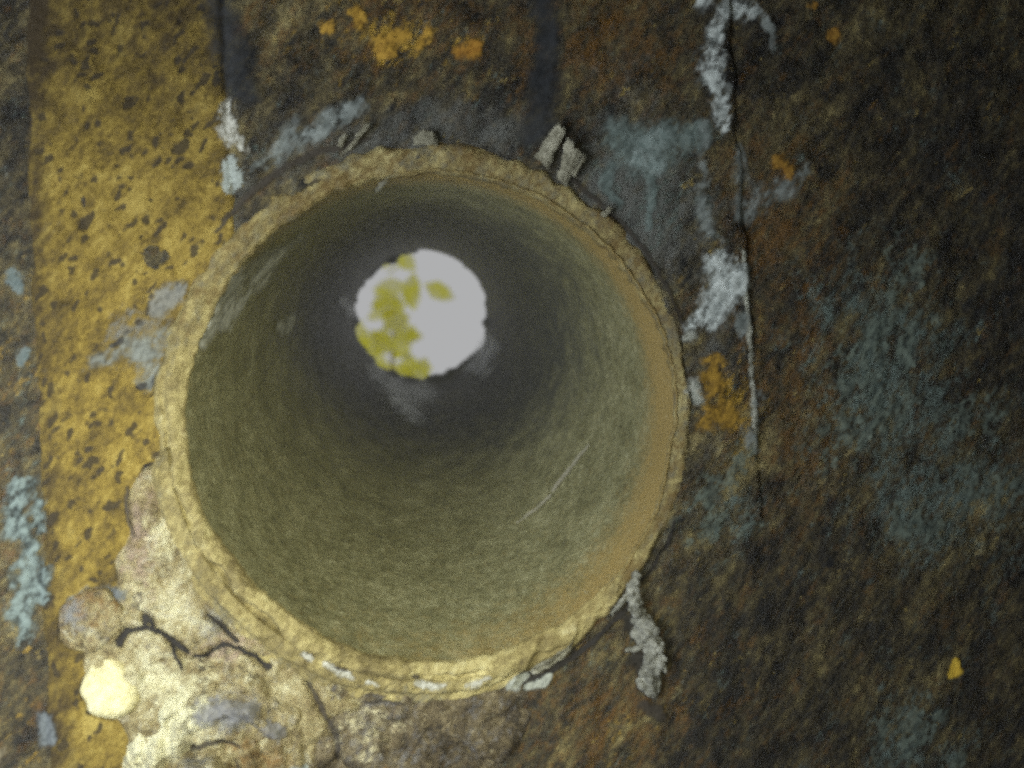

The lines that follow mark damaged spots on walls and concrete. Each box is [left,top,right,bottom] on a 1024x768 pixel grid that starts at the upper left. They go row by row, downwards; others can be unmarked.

corrosion [320,21,334,34]
corrosion [347,7,366,29]
corrosion [372,26,432,60]
corrosion [453,39,482,58]
leakage [273,98,360,156]
leakage [599,0,774,228]
corrosion [772,154,794,180]
leakage [697,185,712,236]
leakage [682,250,759,454]
corrosion [699,353,742,431]
leakage [2,476,51,646]
crack [116,613,272,671]